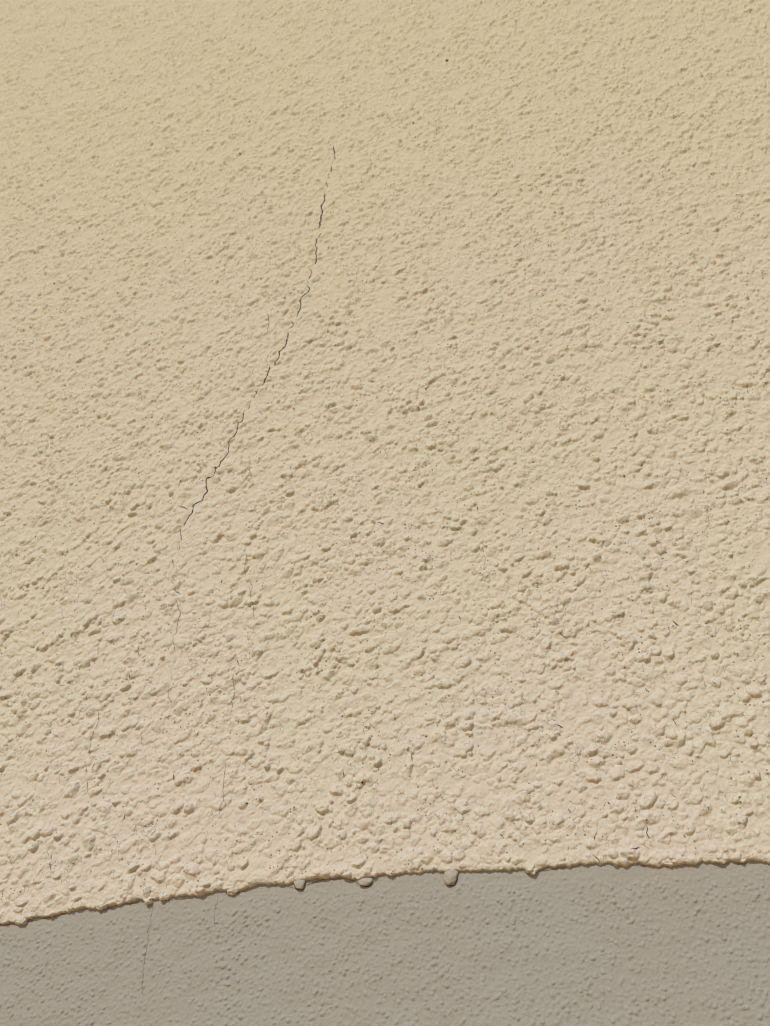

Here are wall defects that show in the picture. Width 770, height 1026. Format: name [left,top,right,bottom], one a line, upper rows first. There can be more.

crack [168,147,335,702]